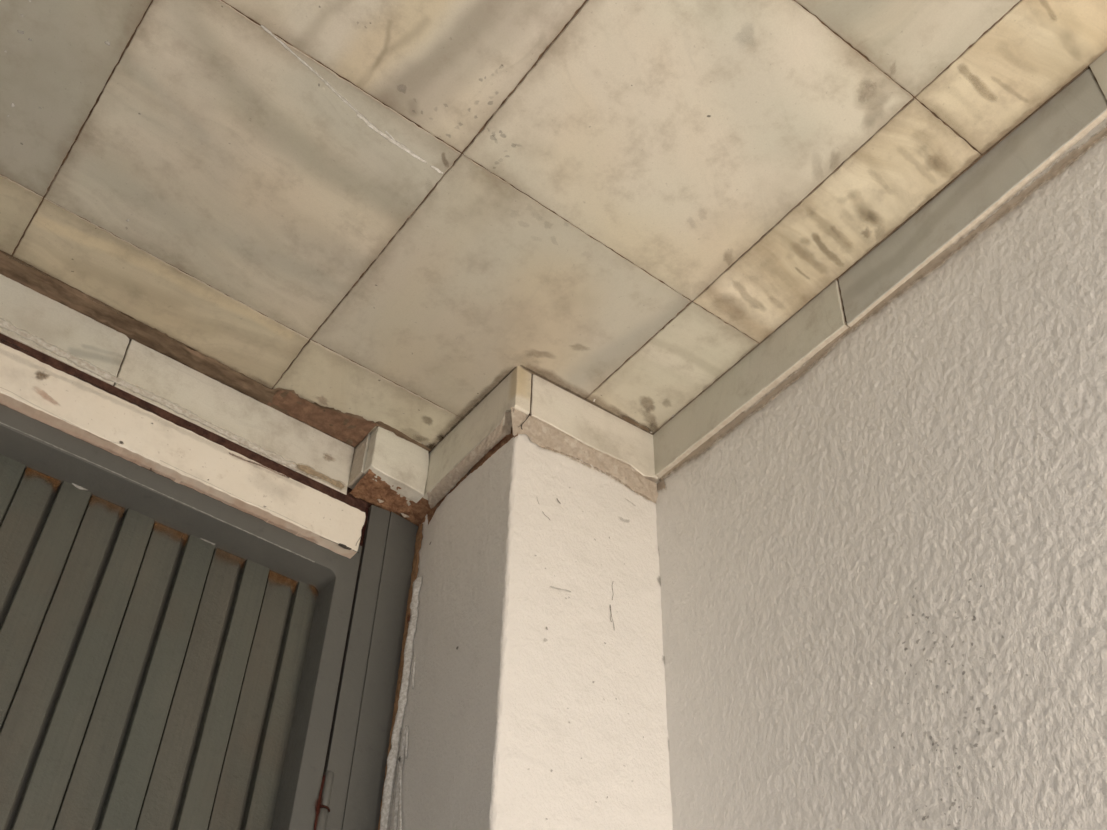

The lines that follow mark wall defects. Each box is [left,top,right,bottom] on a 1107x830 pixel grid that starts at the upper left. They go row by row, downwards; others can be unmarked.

spalling [0,251,431,452]
flaking render [350,407,658,830]